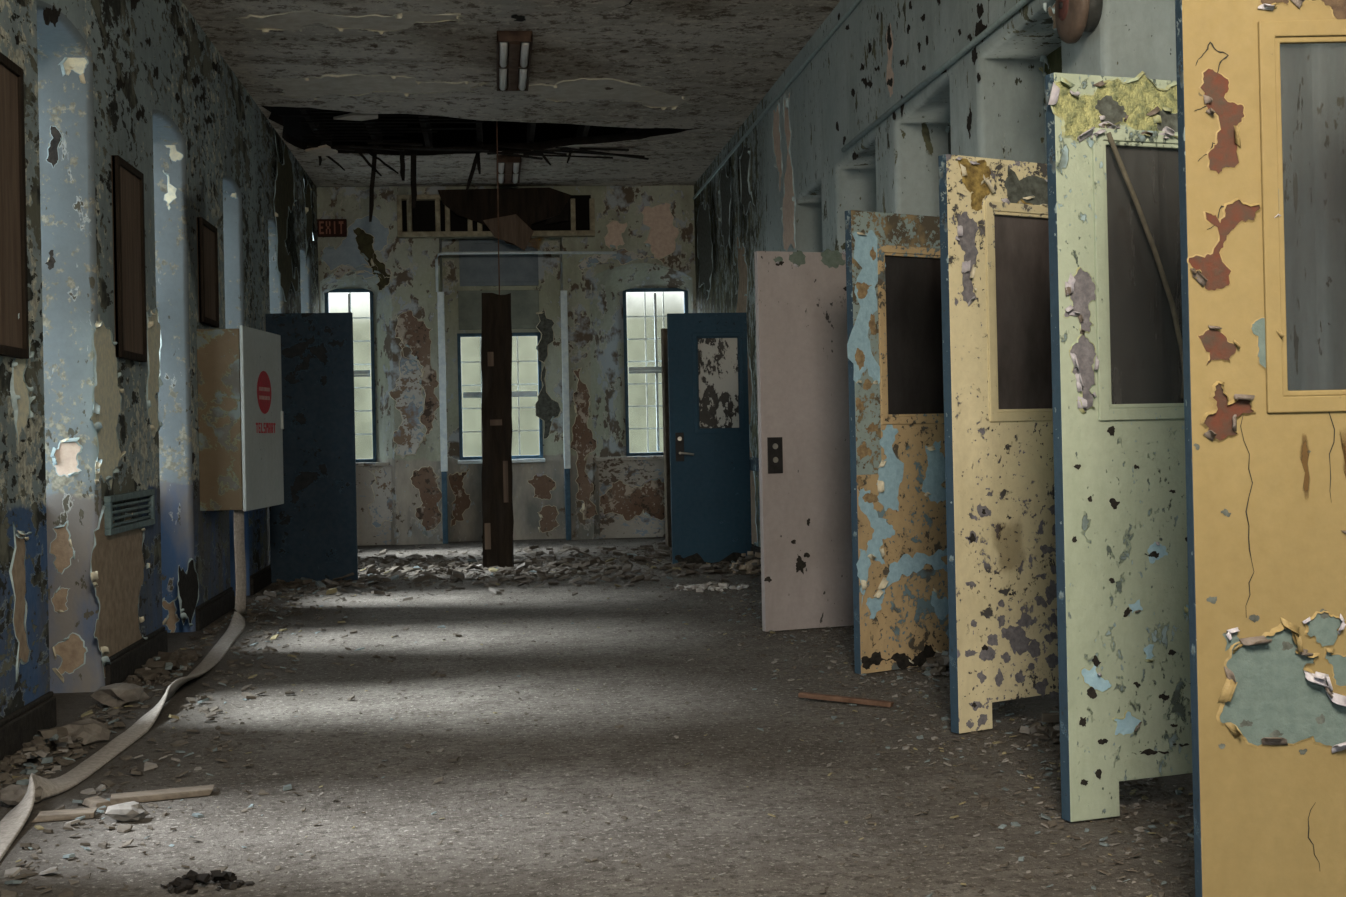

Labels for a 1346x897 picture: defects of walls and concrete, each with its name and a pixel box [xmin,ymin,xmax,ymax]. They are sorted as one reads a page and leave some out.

peeling [1199,67,1245,176]
spalling [271,106,653,302]
peeling [1187,197,1281,292]
peeling [10,338,36,445]
peeling [50,321,126,489]
peeling [146,308,163,438]
peeling [535,310,665,521]
peeling [772,93,947,619]
peeling [1194,381,1256,450]
peeling [1197,317,1285,372]
peeling [49,505,150,683]
peeling [1216,609,1346,755]